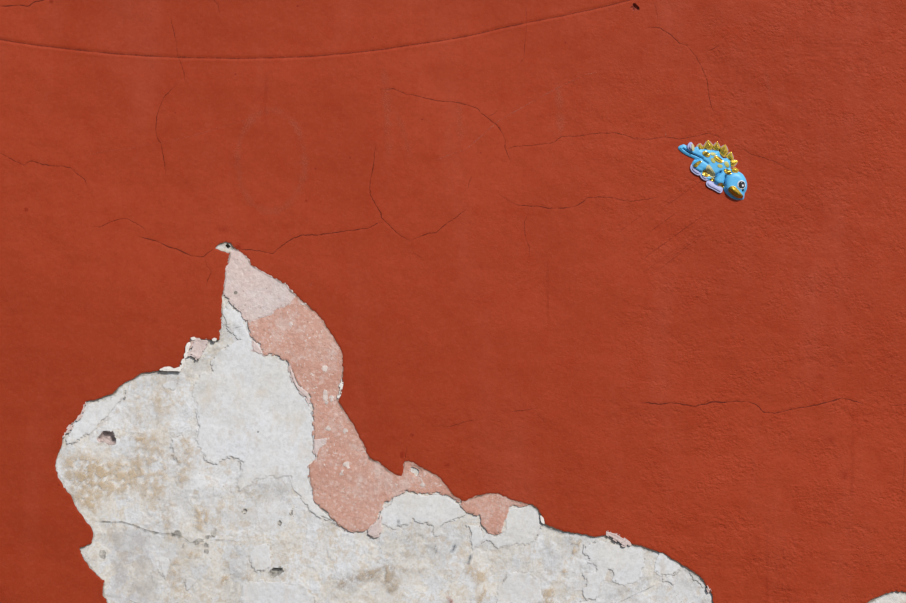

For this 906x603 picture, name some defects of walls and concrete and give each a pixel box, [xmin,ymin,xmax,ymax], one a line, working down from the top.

crack [244,153,461,254]
peeling [55,242,713,603]
crack [646,398,859,413]
peeling [867,591,906,603]